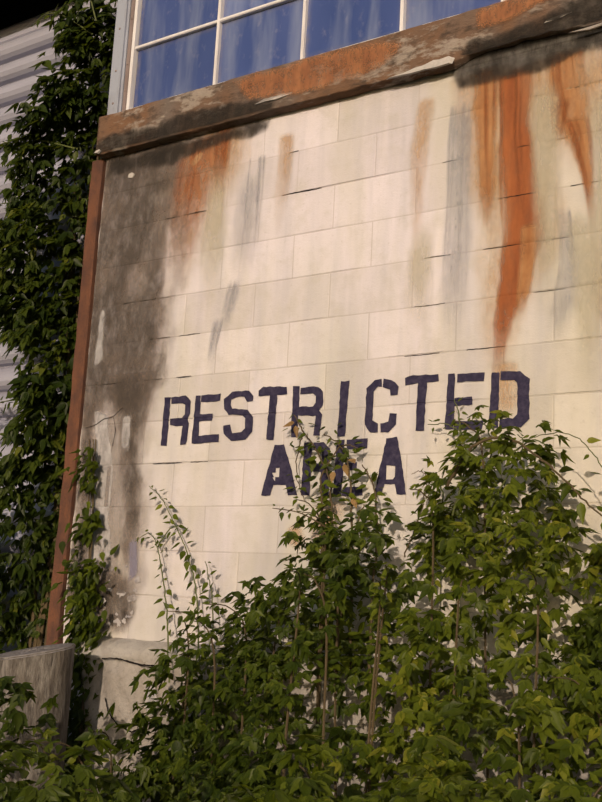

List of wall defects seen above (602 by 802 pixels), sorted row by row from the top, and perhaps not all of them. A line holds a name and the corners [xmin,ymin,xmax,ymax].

corrosion [478,0,543,26]
corrosion [240,43,398,97]
leakage [96,100,272,173]
corrosion [172,128,231,223]
corrosion [470,51,593,343]
peeling [90,569,140,632]